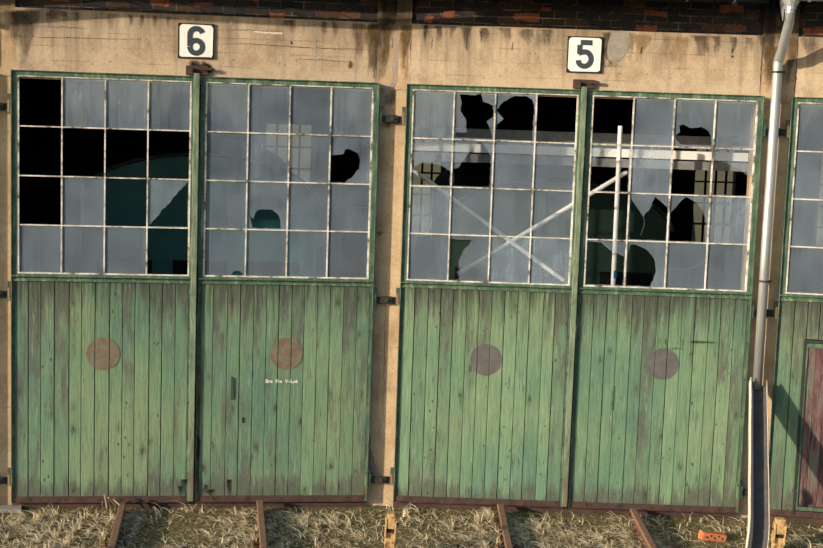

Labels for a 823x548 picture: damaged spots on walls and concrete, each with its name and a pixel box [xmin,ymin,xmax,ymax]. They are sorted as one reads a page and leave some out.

water stain [11,11,31,51]
water stain [353,0,398,66]
water stain [401,27,411,55]